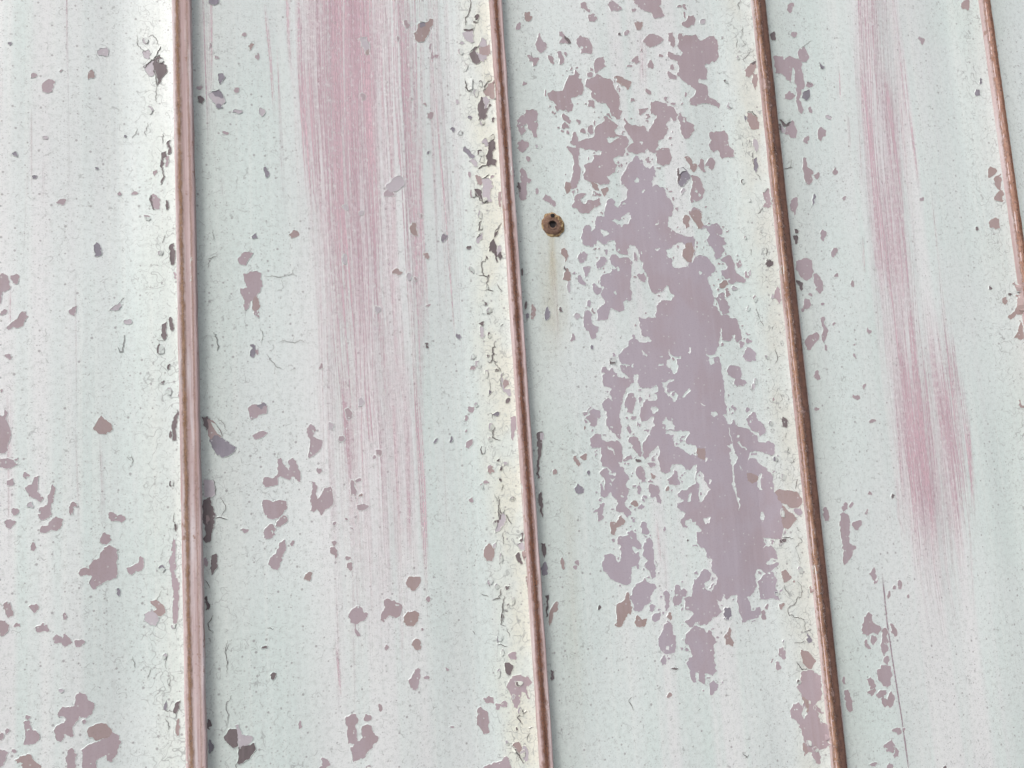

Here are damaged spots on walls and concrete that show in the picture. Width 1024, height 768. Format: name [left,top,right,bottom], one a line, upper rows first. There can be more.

peeling [137,36,168,114]
peeling [450,14,503,263]
rust [541,212,564,237]
peeling [510,0,803,696]
peeling [0,409,78,552]
peeling [77,511,145,597]
peeling [202,479,228,576]
peeling [261,391,373,572]
peeling [347,576,432,651]
peeling [0,688,122,768]
peeling [476,635,533,735]
peeling [770,633,831,765]